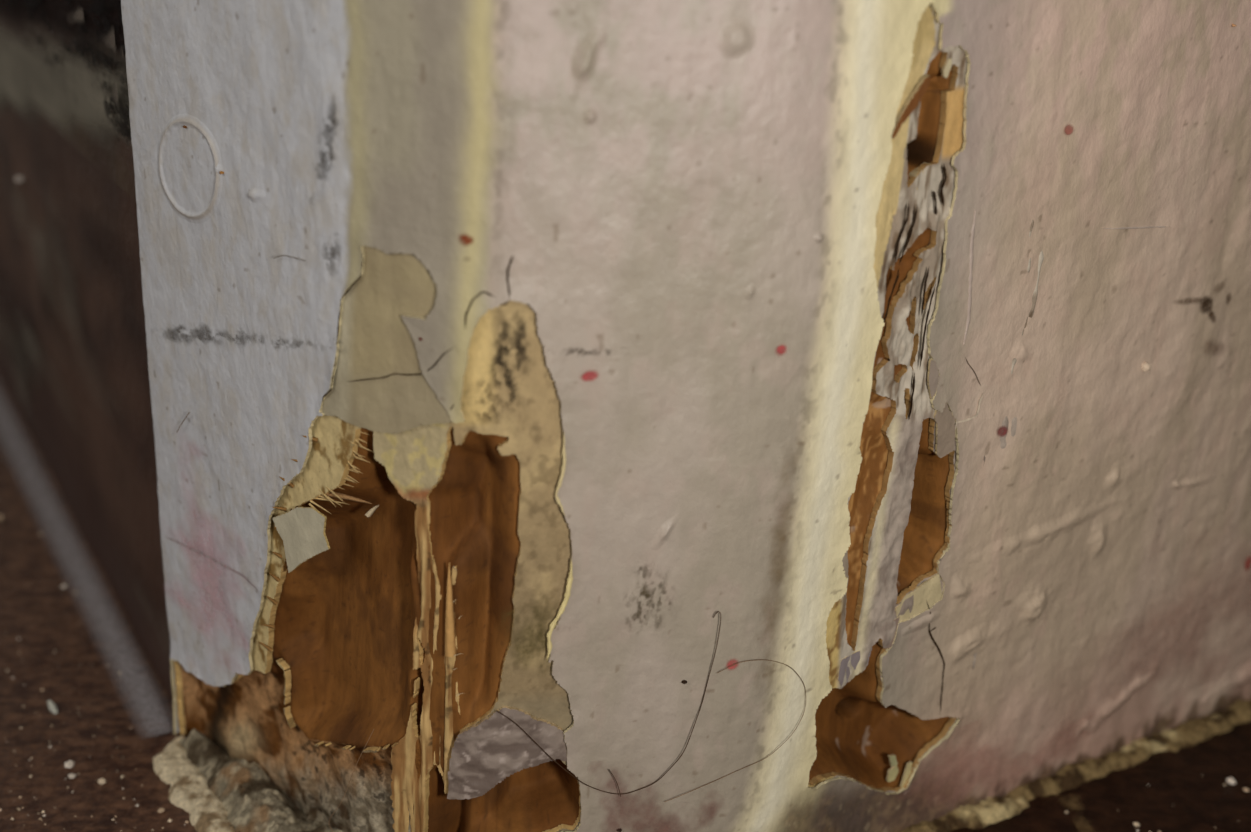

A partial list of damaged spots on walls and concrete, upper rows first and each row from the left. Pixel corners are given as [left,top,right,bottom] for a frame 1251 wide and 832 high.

spalling [174,660,186,735]
spalling [234,246,581,832]
peeling [808,5,968,795]
peeling [1022,251,1044,336]